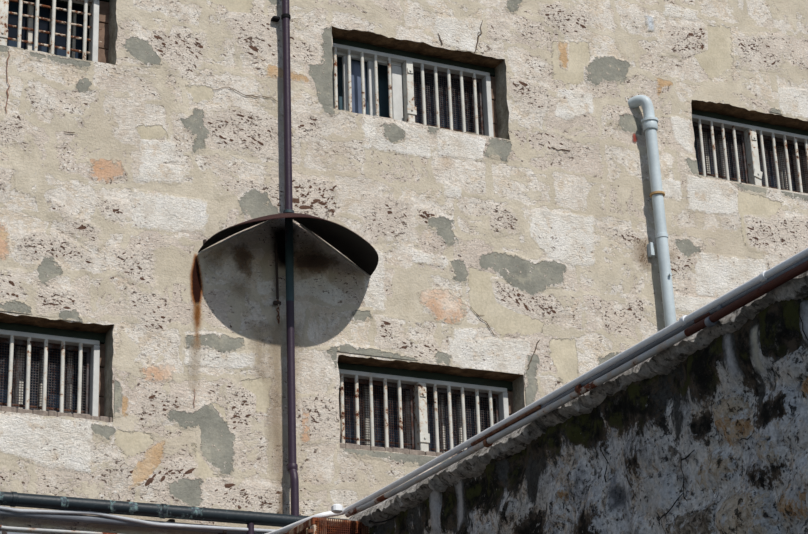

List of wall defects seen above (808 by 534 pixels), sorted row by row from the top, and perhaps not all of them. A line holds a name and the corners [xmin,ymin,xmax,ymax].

crack [3,51,11,113]
rust [191,254,203,347]
leakage [234,245,253,275]
leakage [271,227,339,273]
spalling [294,191,533,376]
spalling [661,174,808,313]
peeling [0,413,93,492]
spalling [122,347,257,440]
spalling [103,438,287,514]
leakage [369,296,808,534]
crack [659,449,695,534]